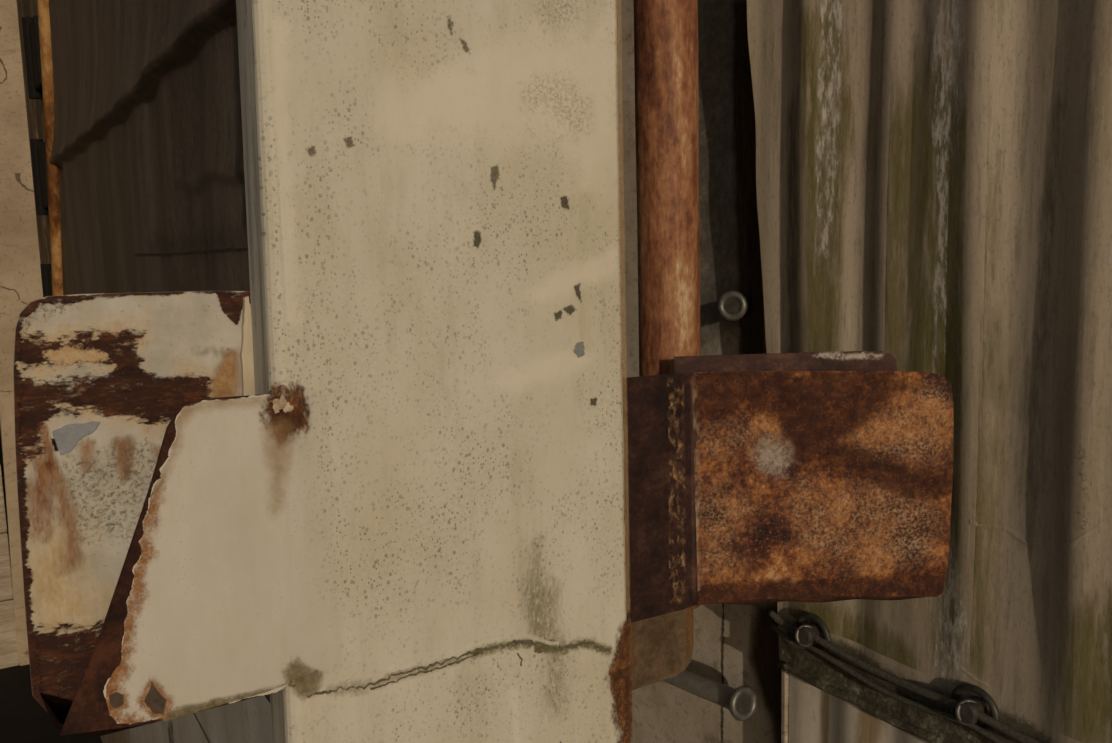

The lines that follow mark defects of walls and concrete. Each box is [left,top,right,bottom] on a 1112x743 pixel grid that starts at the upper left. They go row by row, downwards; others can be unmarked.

water stain [815,0,843,258]
water stain [932,0,965,355]
peeling [52,422,100,455]
corrosion [14,291,251,725]
corrosion [260,385,310,445]
corrosion [696,372,954,591]
peeling [106,480,174,743]
crack [307,631,611,698]
corrosion [606,615,633,743]
corrosion [751,602,781,743]
water stain [934,541,967,682]